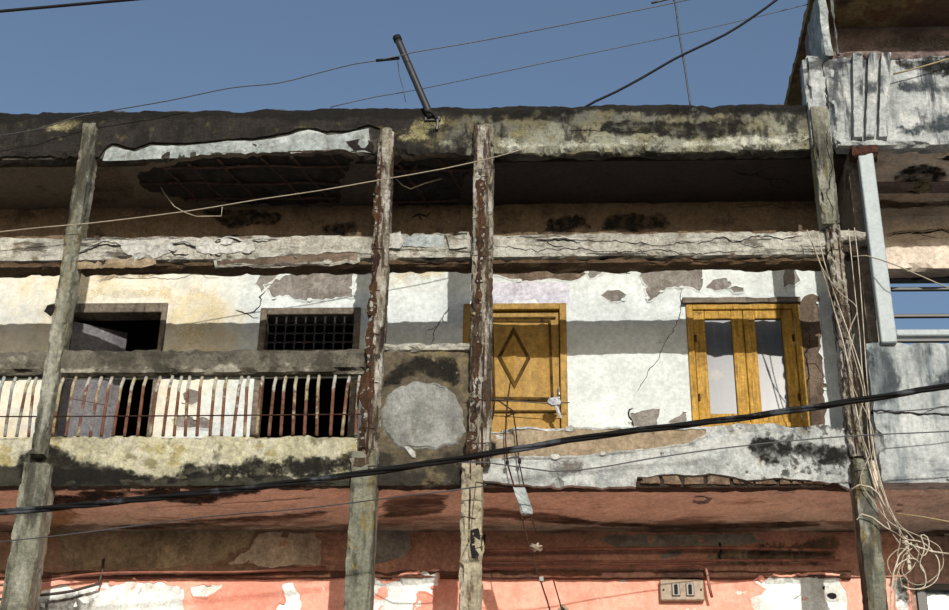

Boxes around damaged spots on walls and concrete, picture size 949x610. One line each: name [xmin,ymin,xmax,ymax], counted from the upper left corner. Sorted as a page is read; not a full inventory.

leakage [830,34,949,125]
leakage [492,109,579,122]
leakage [561,106,792,149]
leakage [898,115,949,136]
crack [890,228,949,238]
spalling [77,252,156,269]
peeling [619,270,745,303]
spalling [103,128,709,610]
crack [628,289,683,427]
leakage [748,437,849,464]
leakage [18,444,352,531]
leakage [381,494,448,517]